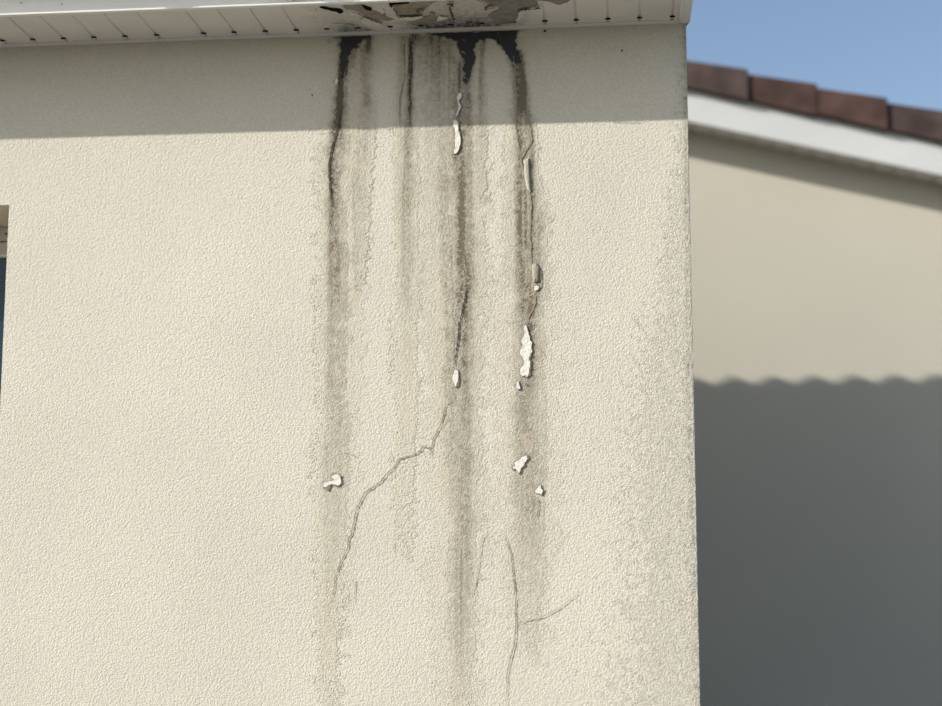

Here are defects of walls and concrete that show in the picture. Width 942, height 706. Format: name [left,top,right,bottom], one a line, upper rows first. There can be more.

peeling [343,1,448,28]
peeling [477,0,570,24]
flaking render [452,92,462,155]
leakage [298,0,555,706]
crack [454,285,467,367]
flaking render [513,324,533,390]
flaking render [322,472,342,491]
crack [328,391,455,614]
flaking render [511,454,529,474]
crack [471,529,582,694]